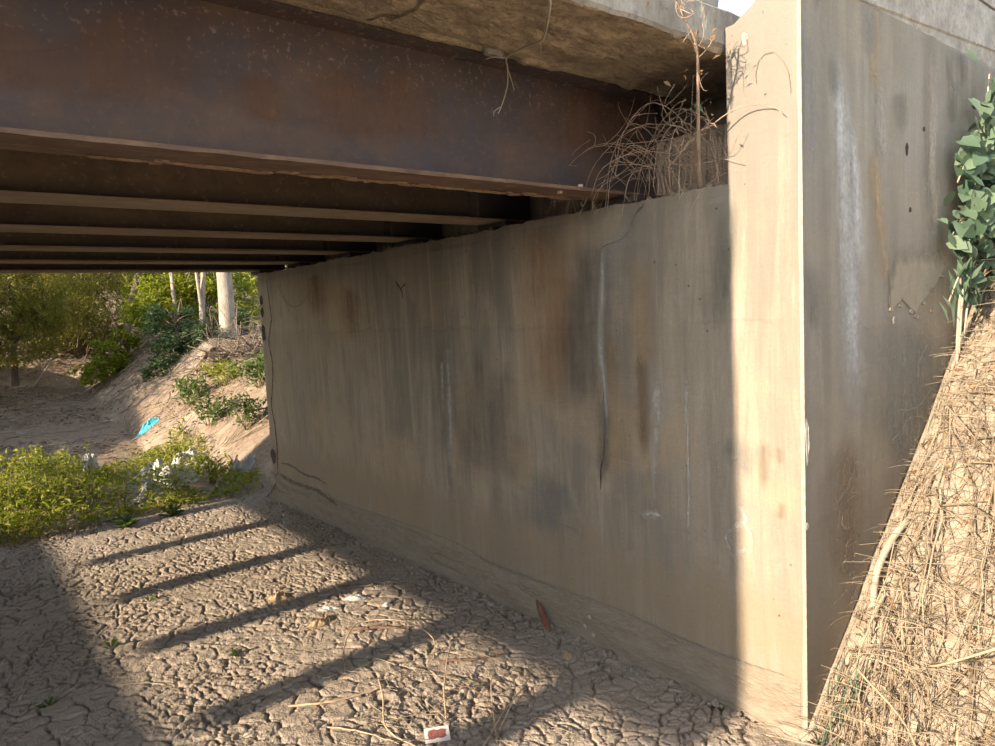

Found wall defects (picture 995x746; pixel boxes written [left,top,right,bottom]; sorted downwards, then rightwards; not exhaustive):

crack [367,0,425,22]
rust [85,155,571,200]
efflorescence [836,79,863,375]
peeling [888,254,945,324]
crack [266,281,337,506]
crack [599,382,607,489]